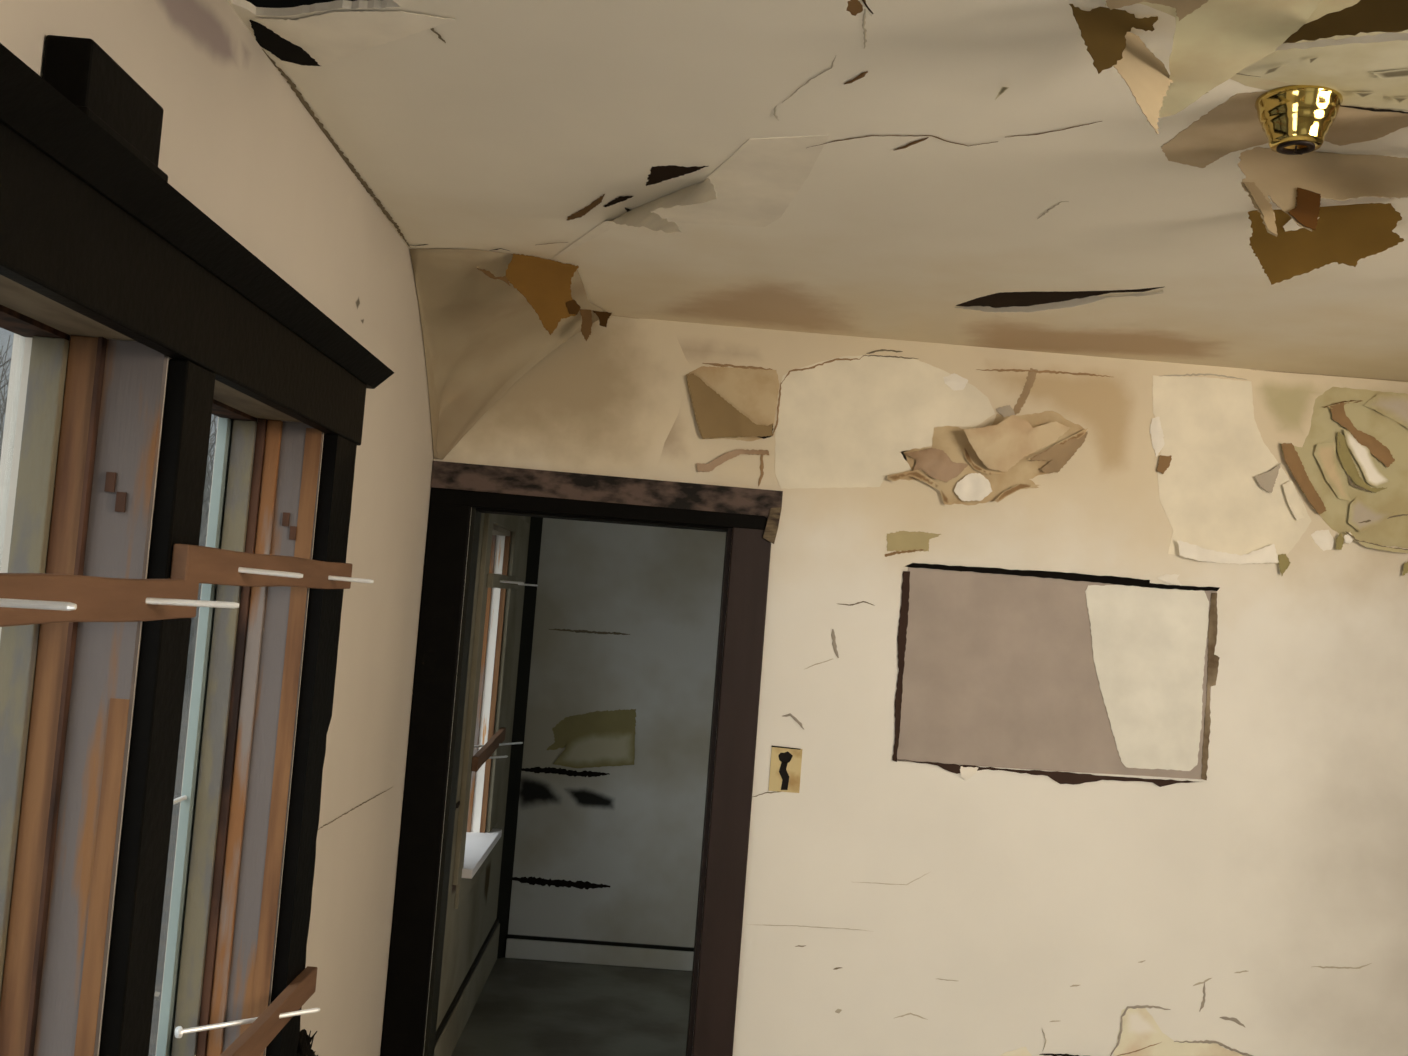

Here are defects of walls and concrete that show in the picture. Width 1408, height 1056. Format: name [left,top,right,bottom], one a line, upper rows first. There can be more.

spalling [246,0,356,8]
flaking render [1305,0,1360,24]
crack [773,9,868,120]
crack [807,121,1102,150]
flaking render [1161,71,1293,168]
flaking render [1324,105,1408,146]
peeling [888,411,1088,505]
peeling [1280,387,1408,553]
crack [1313,962,1372,970]
crack [1039,970,1248,1056]